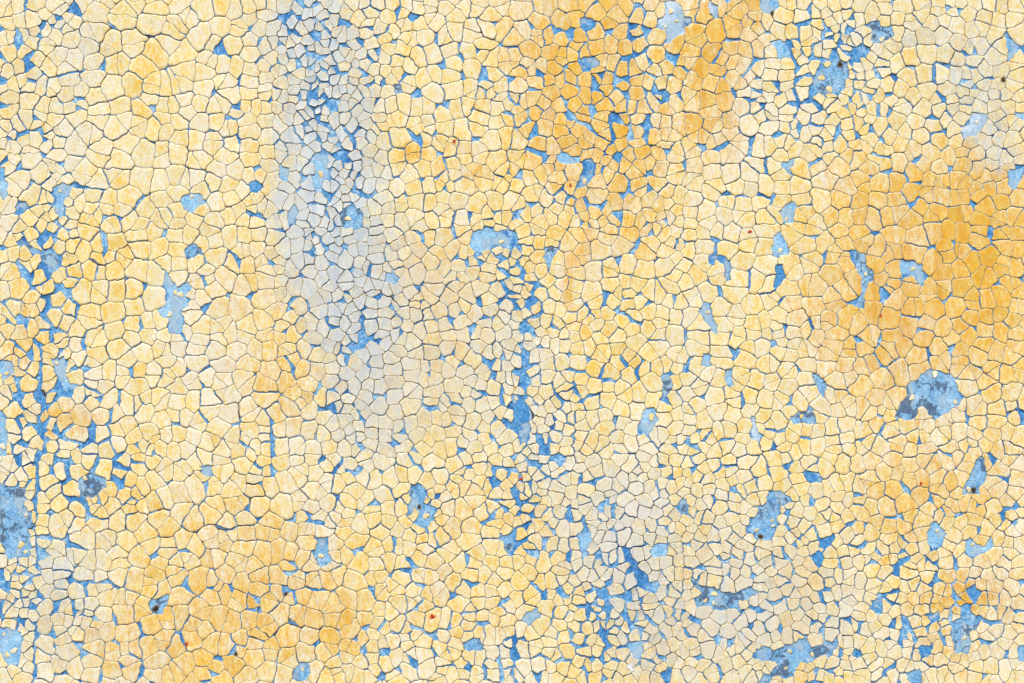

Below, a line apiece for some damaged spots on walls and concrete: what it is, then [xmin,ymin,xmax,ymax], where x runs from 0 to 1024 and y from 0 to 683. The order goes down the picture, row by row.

crack [82,21,168,53]
peeling [75,0,200,57]
peeling [795,58,849,102]
peeling [142,270,192,334]
peeling [887,358,962,420]
crack [524,388,534,462]
peeling [0,483,32,559]
crack [27,342,46,677]
crack [125,467,284,550]
peeling [748,491,791,541]
crack [238,590,325,661]
peeling [755,635,837,683]